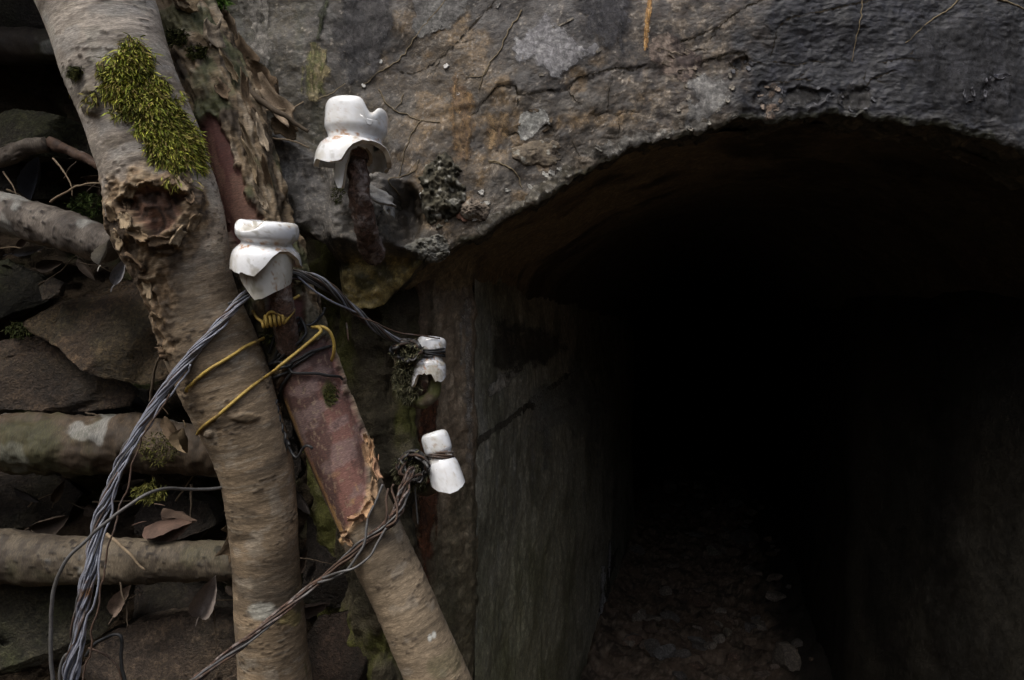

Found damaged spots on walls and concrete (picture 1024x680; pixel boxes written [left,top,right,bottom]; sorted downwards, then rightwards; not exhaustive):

crack [397,1,494,74]
peeling [512,13,603,77]
crack [471,65,645,159]